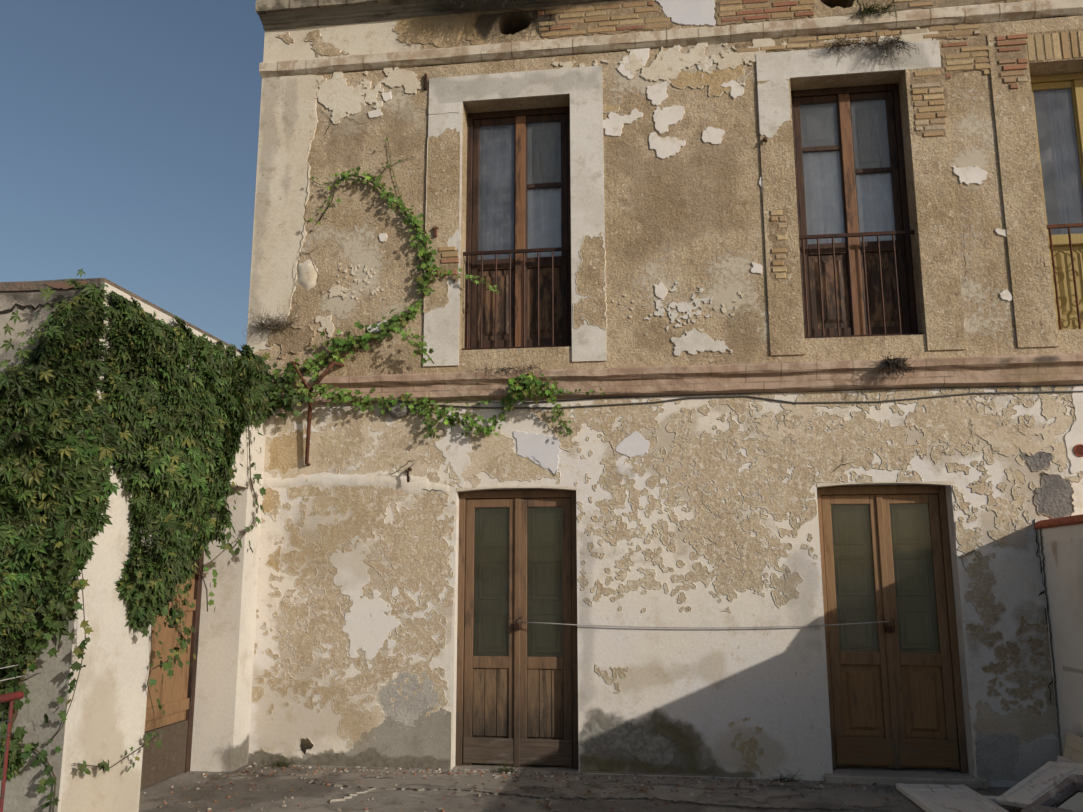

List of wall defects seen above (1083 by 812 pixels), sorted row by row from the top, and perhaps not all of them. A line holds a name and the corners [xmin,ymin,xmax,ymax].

flaking render [664,24,1029,137]
crack [0,301,67,314]
flaking render [573,232,712,335]
flaking render [248,401,561,770]
flaking render [528,386,1083,723]
leakage [579,709,699,770]